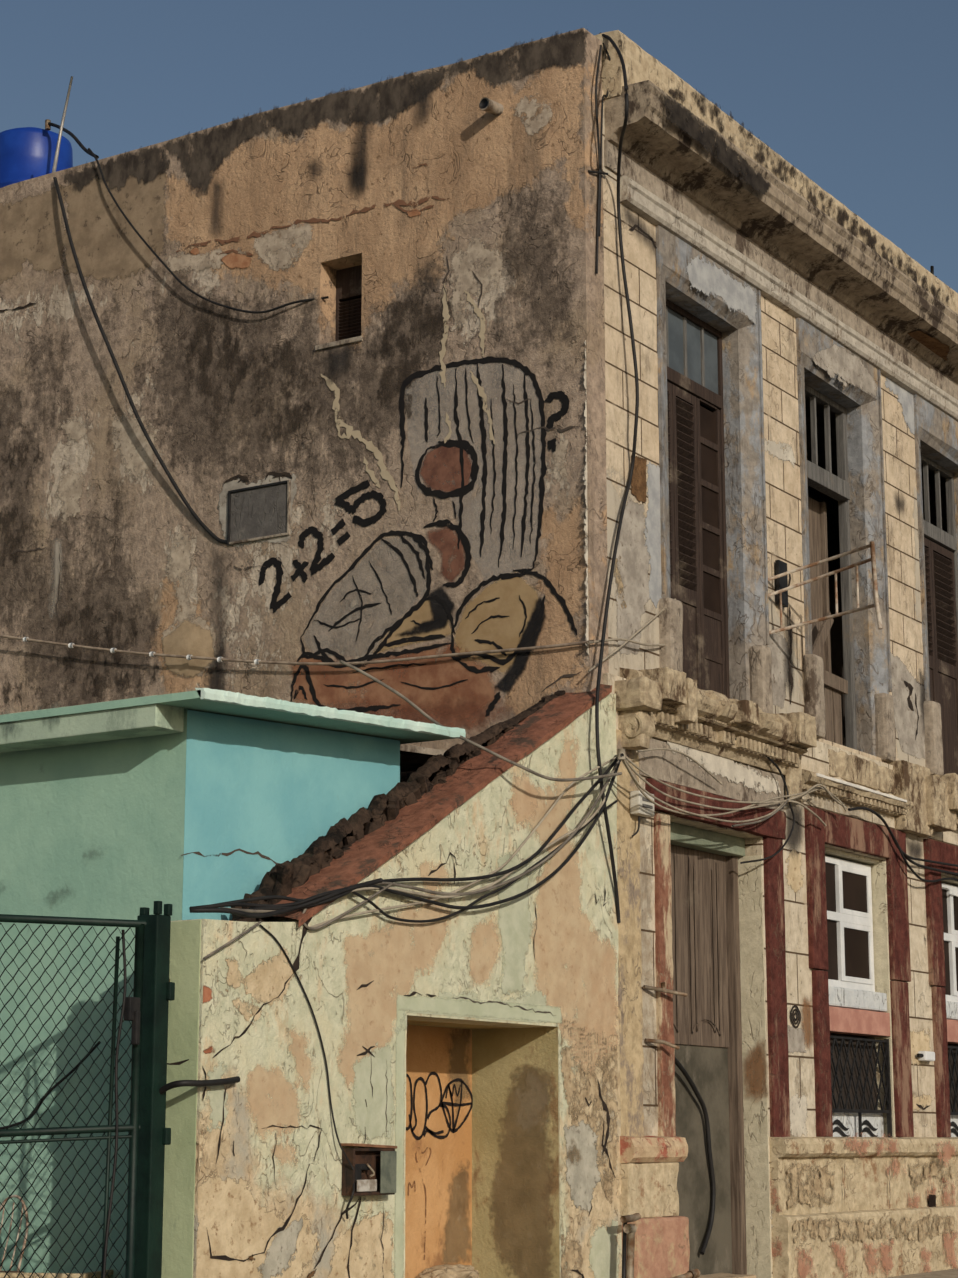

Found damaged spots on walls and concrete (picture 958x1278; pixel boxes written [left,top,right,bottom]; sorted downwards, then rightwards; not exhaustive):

flaking render [0,172,314,284]
damp [183,290,321,442]
damp [64,29,589,229]
flaking render [686,256,757,325]
damp [664,89,950,301]
crack [321,374,401,511]
crack [181,848,280,864]
flaking render [470,740,619,1204]
flaking render [196,1033,395,1278]
crack [314,1197,384,1278]
crack [357,1046,388,1143]
damp [491,1065,553,1278]